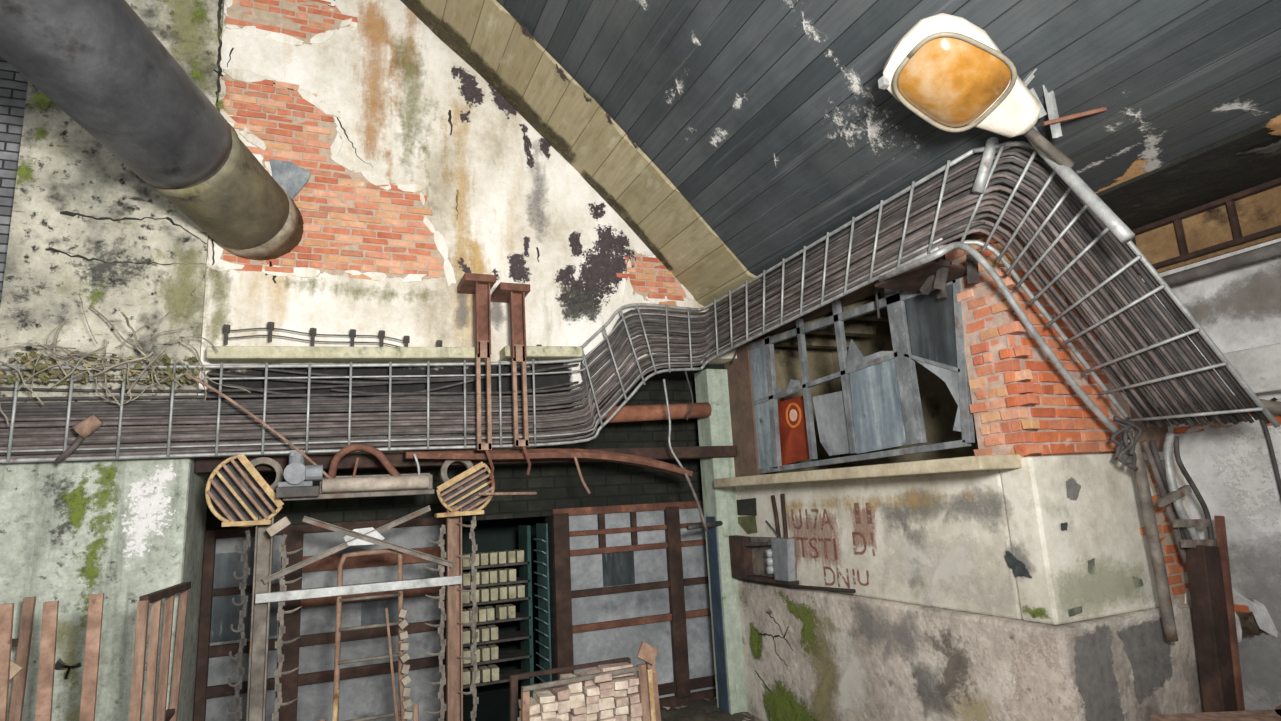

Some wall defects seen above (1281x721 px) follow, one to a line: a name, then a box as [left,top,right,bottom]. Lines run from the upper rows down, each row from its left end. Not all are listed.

crack [213,0,234,112]
flaking render [224,0,358,46]
flaking render [206,68,471,287]
water stain [397,0,673,274]
spalling [1235,115,1281,155]
crack [45,211,215,265]
peeling [492,236,532,283]
water stain [560,282,602,321]
peeling [554,203,695,315]
peeling [1173,398,1281,533]
water stain [750,623,763,658]
water stain [828,606,989,721]